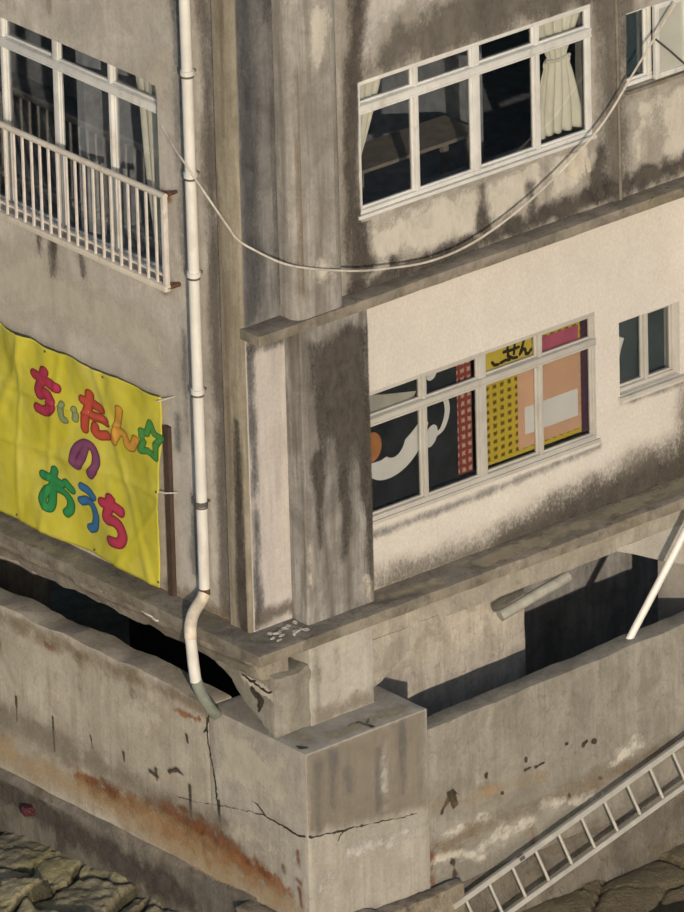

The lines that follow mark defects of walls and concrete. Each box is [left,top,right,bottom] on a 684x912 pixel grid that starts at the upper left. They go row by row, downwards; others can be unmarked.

damp [343,0,684,295]
damp [196,0,292,632]
damp [309,325,684,600]
spalling [241,676,273,712]
corrosion [74,771,302,906]
crack [179,715,417,841]
spalling [441,789,459,815]